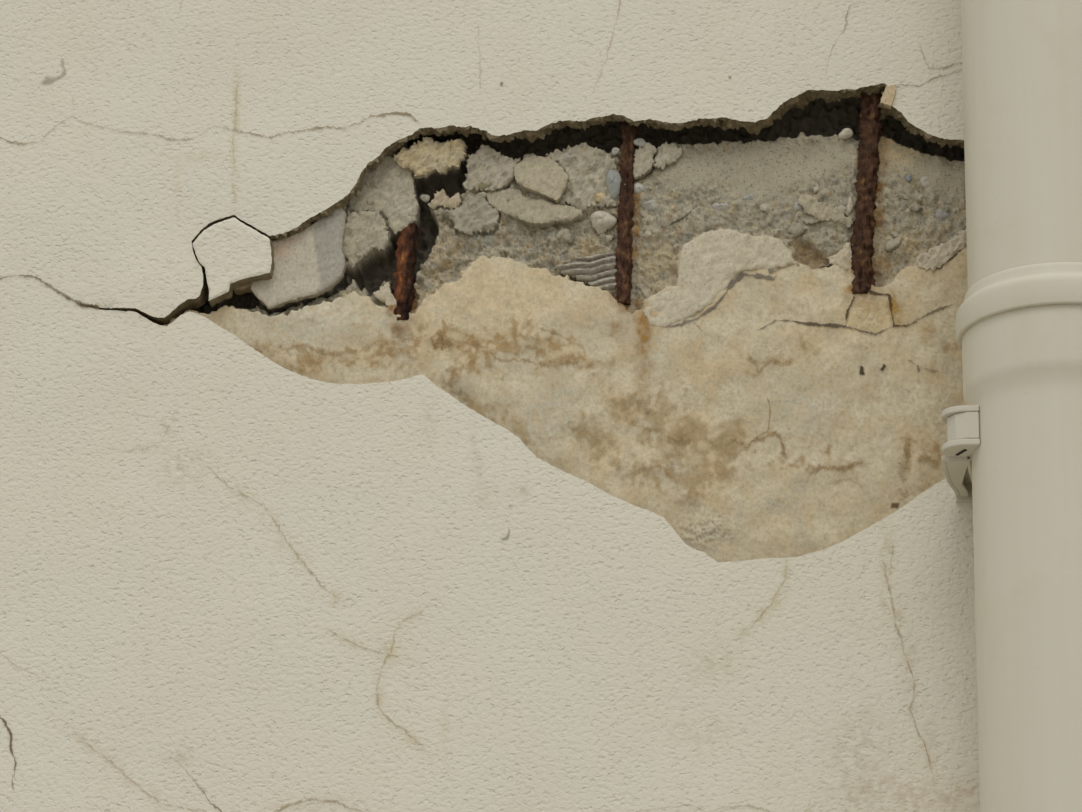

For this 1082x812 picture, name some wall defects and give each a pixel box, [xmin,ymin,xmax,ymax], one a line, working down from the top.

crack [236,112,418,138]
crack [0,275,99,309]
spalling [91,83,968,562]
crack [0,717,17,787]